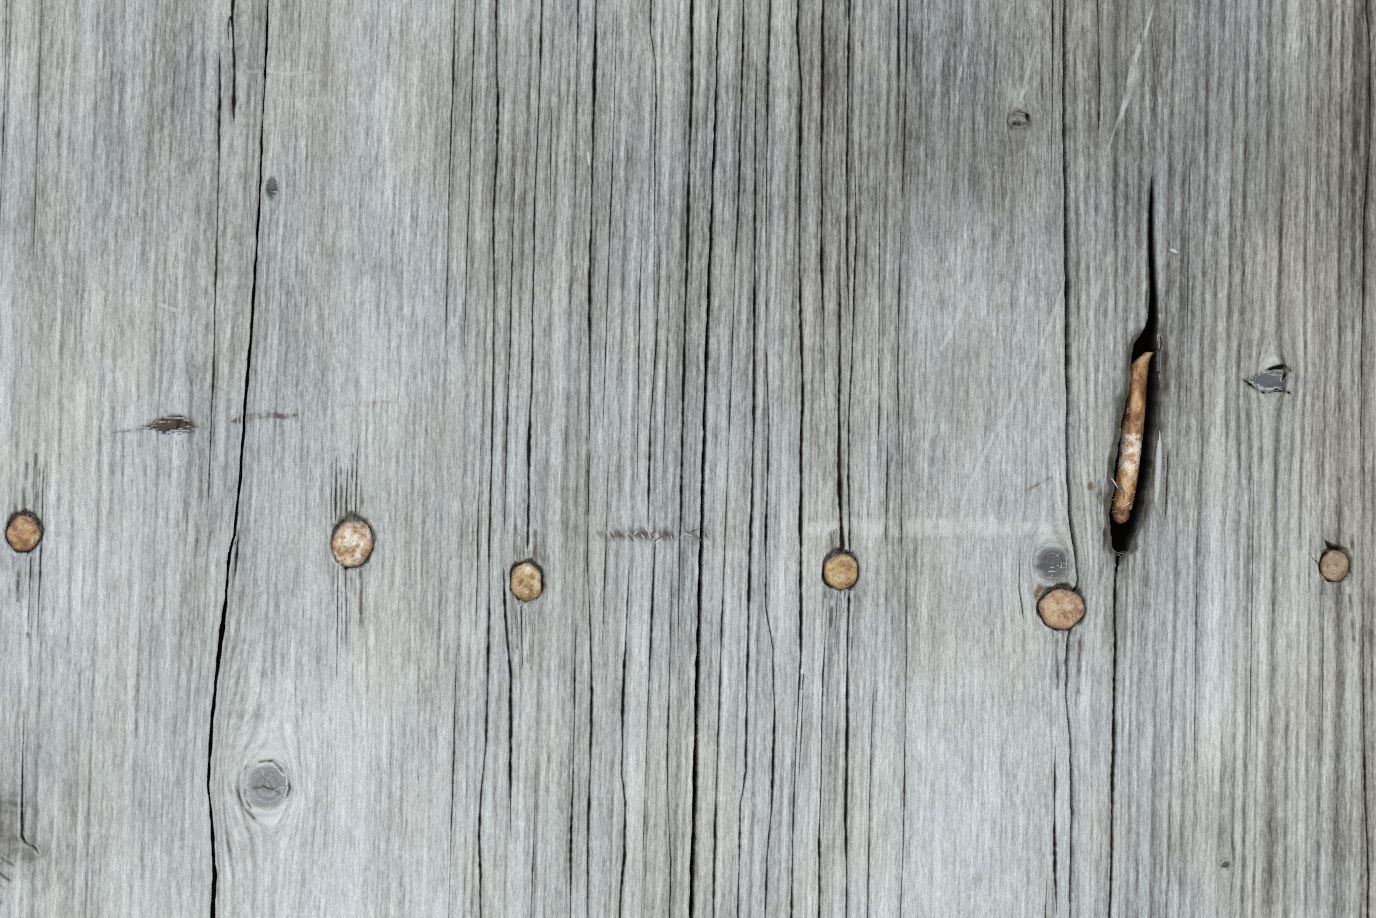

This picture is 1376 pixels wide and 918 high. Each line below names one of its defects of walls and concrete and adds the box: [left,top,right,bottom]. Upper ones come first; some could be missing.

crack [204,0,242,580]
crack [1357,0,1374,503]
rust [0,450,50,640]
rust [315,450,383,653]
rust [499,521,557,673]
crack [443,0,697,918]
crack [710,0,911,918]
rust [808,528,873,664]
rust [1028,553,1094,696]
rust [1310,474,1359,667]
crack [1042,740,1060,918]
crack [1360,628,1372,918]